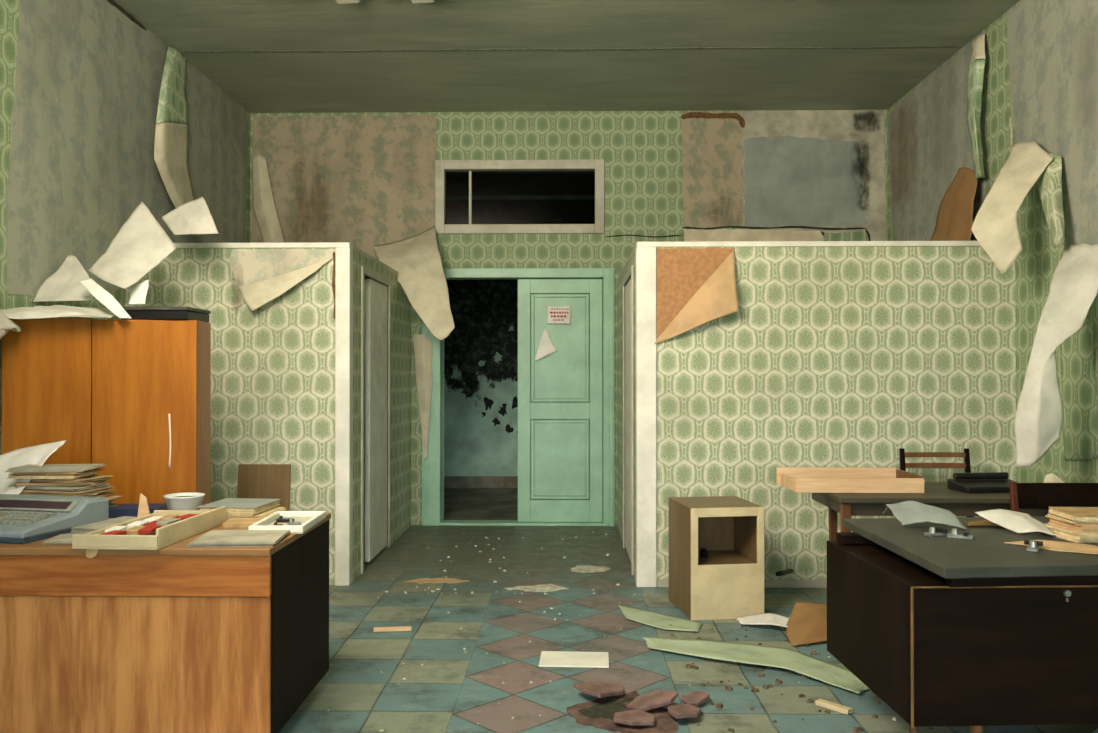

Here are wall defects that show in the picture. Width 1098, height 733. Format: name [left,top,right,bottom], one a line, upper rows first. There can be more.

leakage [854,112,877,130]
flaking render [742,110,887,241]
leakage [854,146,868,197]